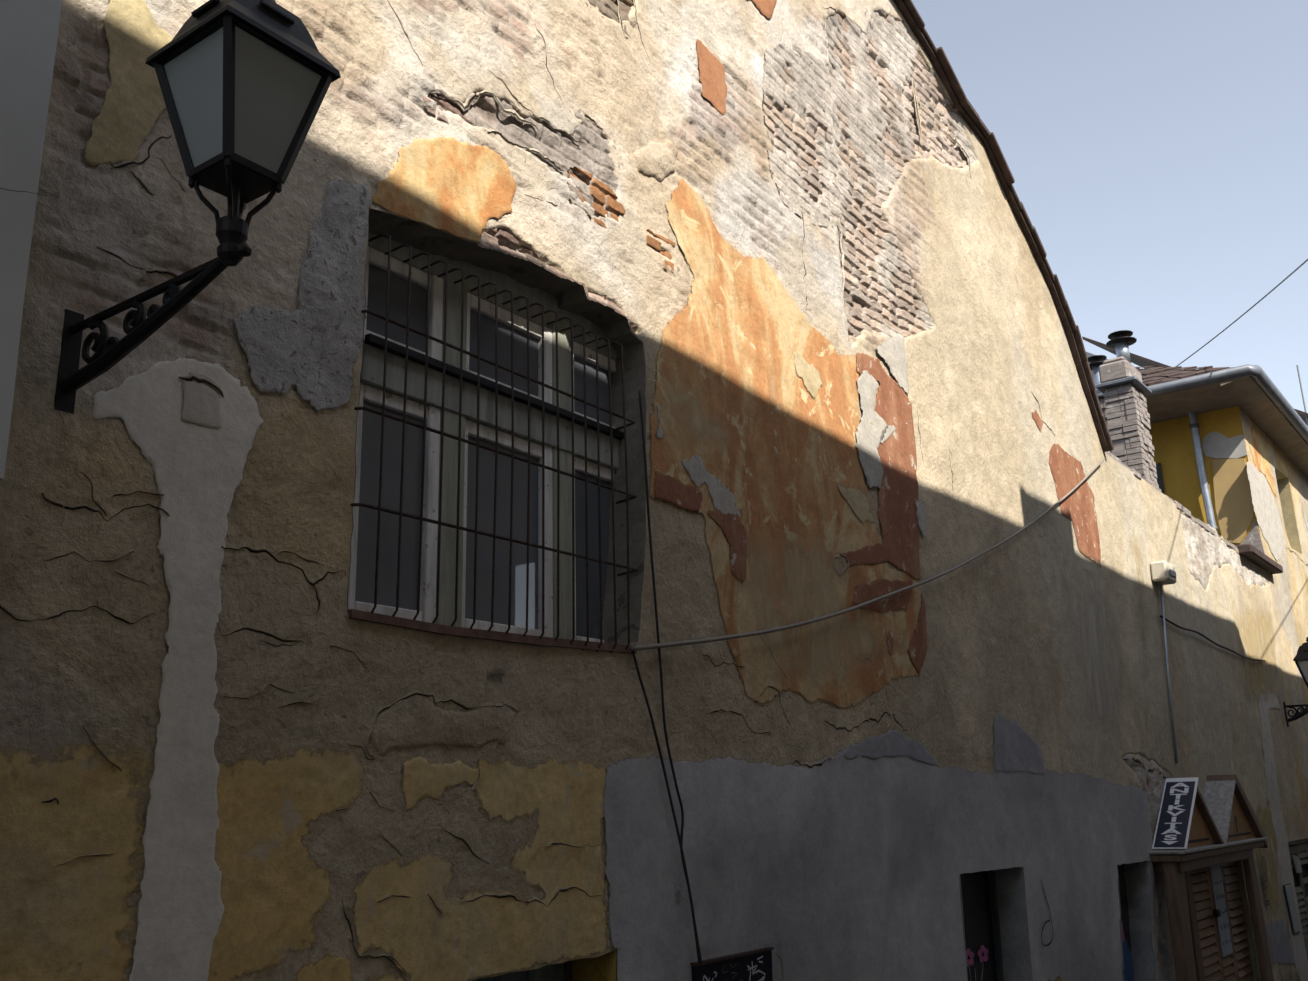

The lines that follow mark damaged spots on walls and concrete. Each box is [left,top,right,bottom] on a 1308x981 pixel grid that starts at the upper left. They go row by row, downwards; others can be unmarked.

flaking render [585,0,637,39]
spalling [233,93,626,412]
peeling [646,3,976,708]
crack [42,472,170,521]
peeling [1049,443,1101,567]
crack [0,551,156,624]
crack [221,546,370,672]
crack [349,691,518,790]
crack [791,711,908,769]
peeling [0,743,150,981]
peeling [207,747,607,981]
crack [377,825,601,914]